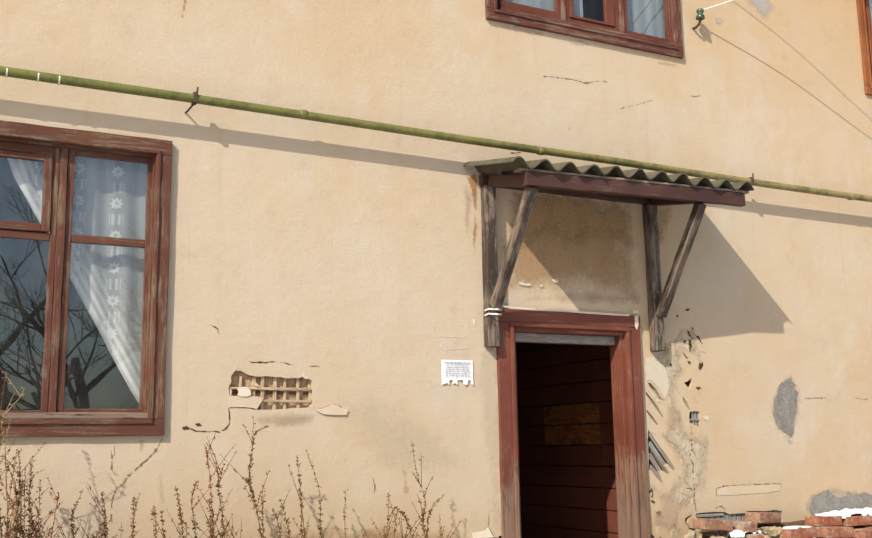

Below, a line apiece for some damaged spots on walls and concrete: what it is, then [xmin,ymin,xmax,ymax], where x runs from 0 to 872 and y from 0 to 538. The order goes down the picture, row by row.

water stain [514,195,628,287]
spalling [229,371,349,415]
spalling [645,327,782,538]